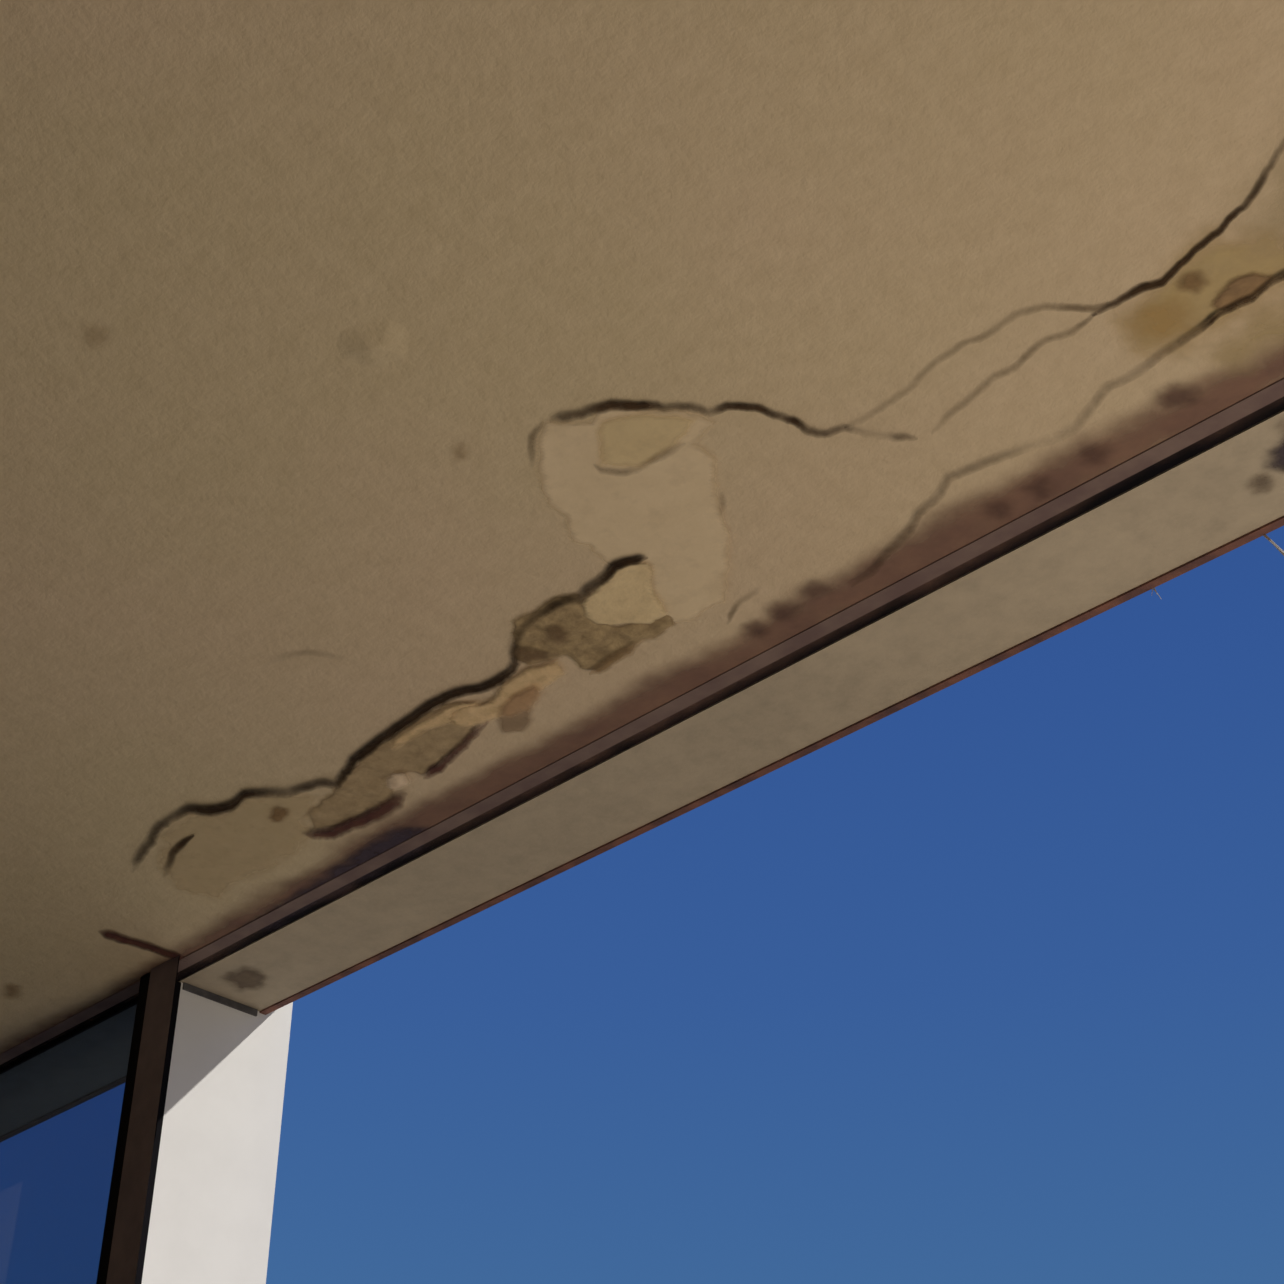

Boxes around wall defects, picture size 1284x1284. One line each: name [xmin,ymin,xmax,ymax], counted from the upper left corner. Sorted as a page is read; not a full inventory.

crack [1069,166,1272,314]
water stain [1128,241,1284,348]
crack [1180,274,1284,345]
crack [560,401,840,436]
peeling [163,410,729,896]
crack [543,556,647,615]
water stain [112,349,1284,995]
crack [136,655,519,864]